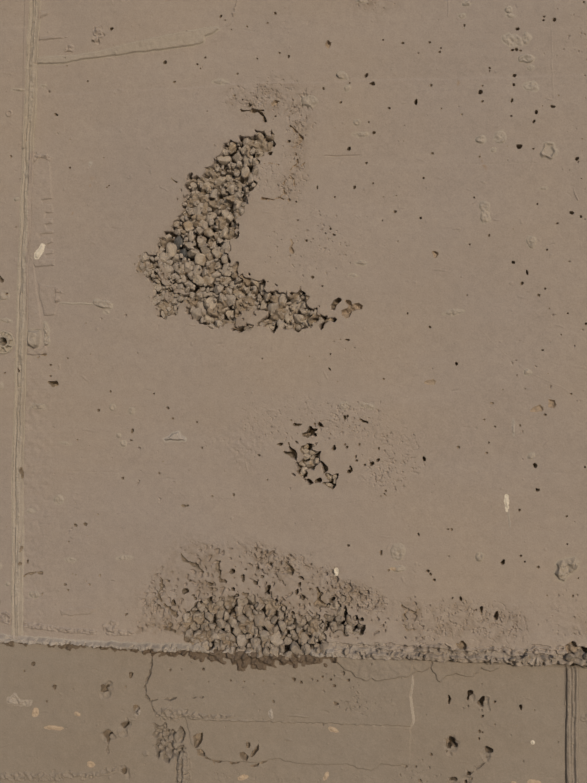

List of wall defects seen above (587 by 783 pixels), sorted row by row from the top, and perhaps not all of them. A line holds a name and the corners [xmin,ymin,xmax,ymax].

spalling [127,69,384,368]
spalling [163,380,433,509]
spalling [98,705,139,744]
crack [143,657,204,715]
crack [205,756,267,767]
peeling [134,541,587,783]